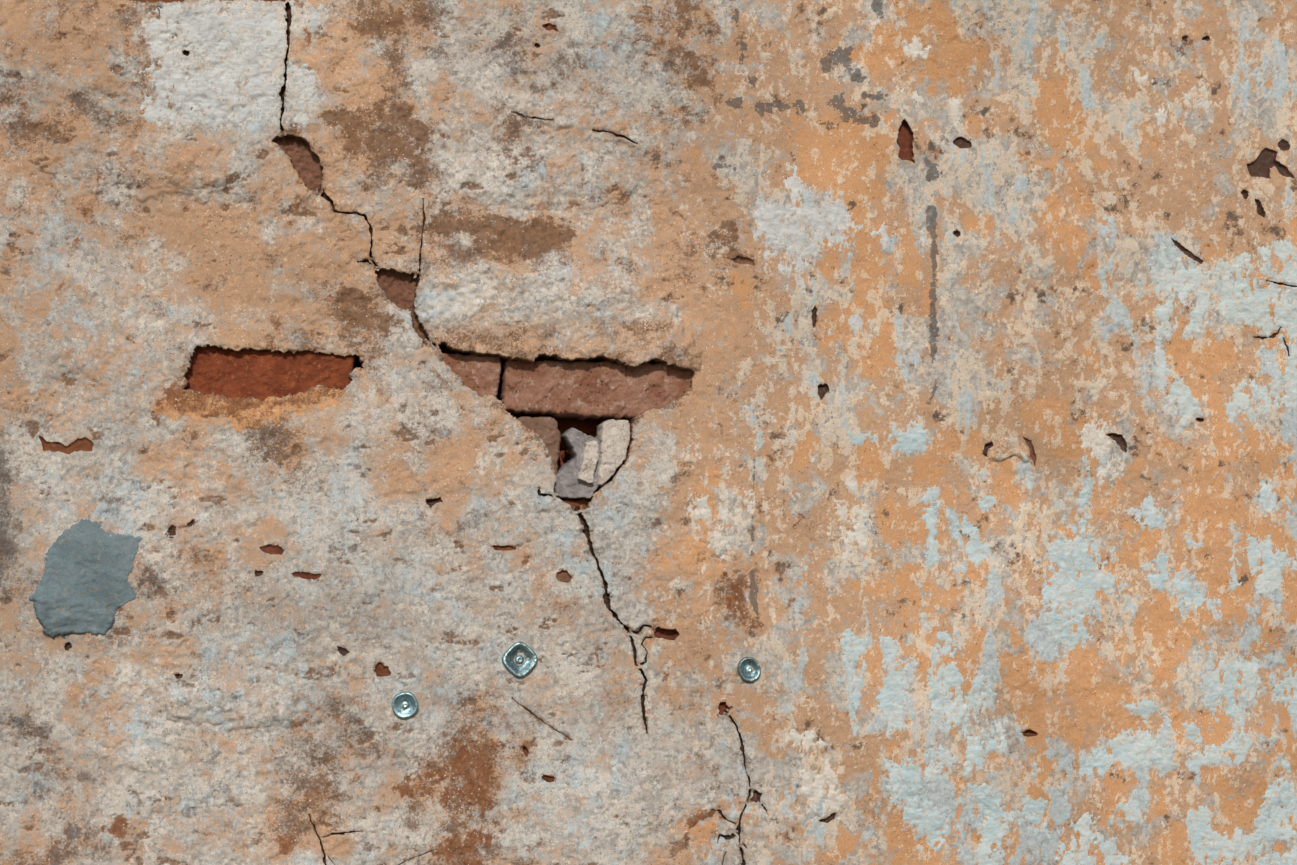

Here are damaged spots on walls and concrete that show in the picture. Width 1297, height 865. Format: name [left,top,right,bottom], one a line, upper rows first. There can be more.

peeling [127,0,326,197]
crack [276,0,294,137]
spalling [181,342,366,403]
crack [315,185,382,271]
crack [413,199,428,279]
crack [424,336,441,349]
spalling [372,265,697,514]
peeling [1148,237,1297,429]
crack [535,488,656,733]
peeling [1041,419,1297,651]
crack [711,708,771,865]
peeling [883,630,1149,865]